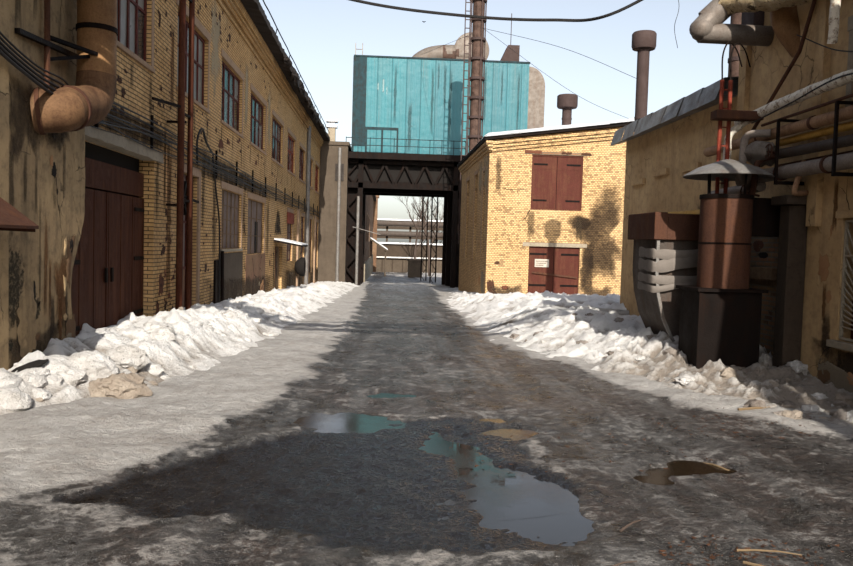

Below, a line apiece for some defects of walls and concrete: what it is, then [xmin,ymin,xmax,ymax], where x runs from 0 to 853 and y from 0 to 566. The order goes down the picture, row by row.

water stain [9,245,26,369]
water stain [31,300,68,353]